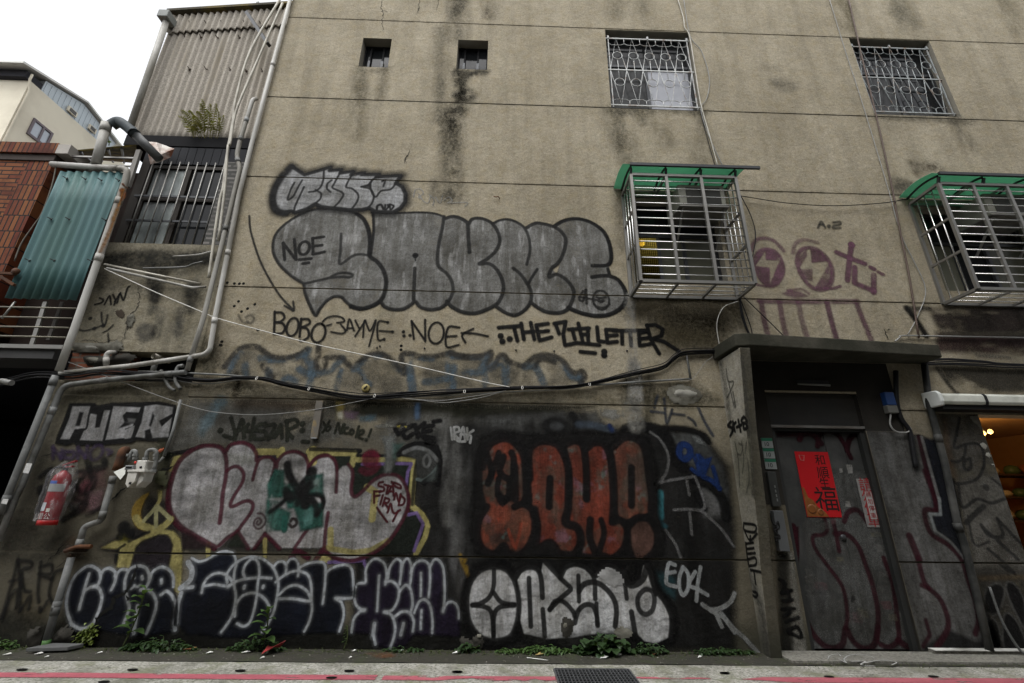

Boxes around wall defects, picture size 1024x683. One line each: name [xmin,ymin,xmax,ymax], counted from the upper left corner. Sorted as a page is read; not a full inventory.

water stain [437,68,488,153]